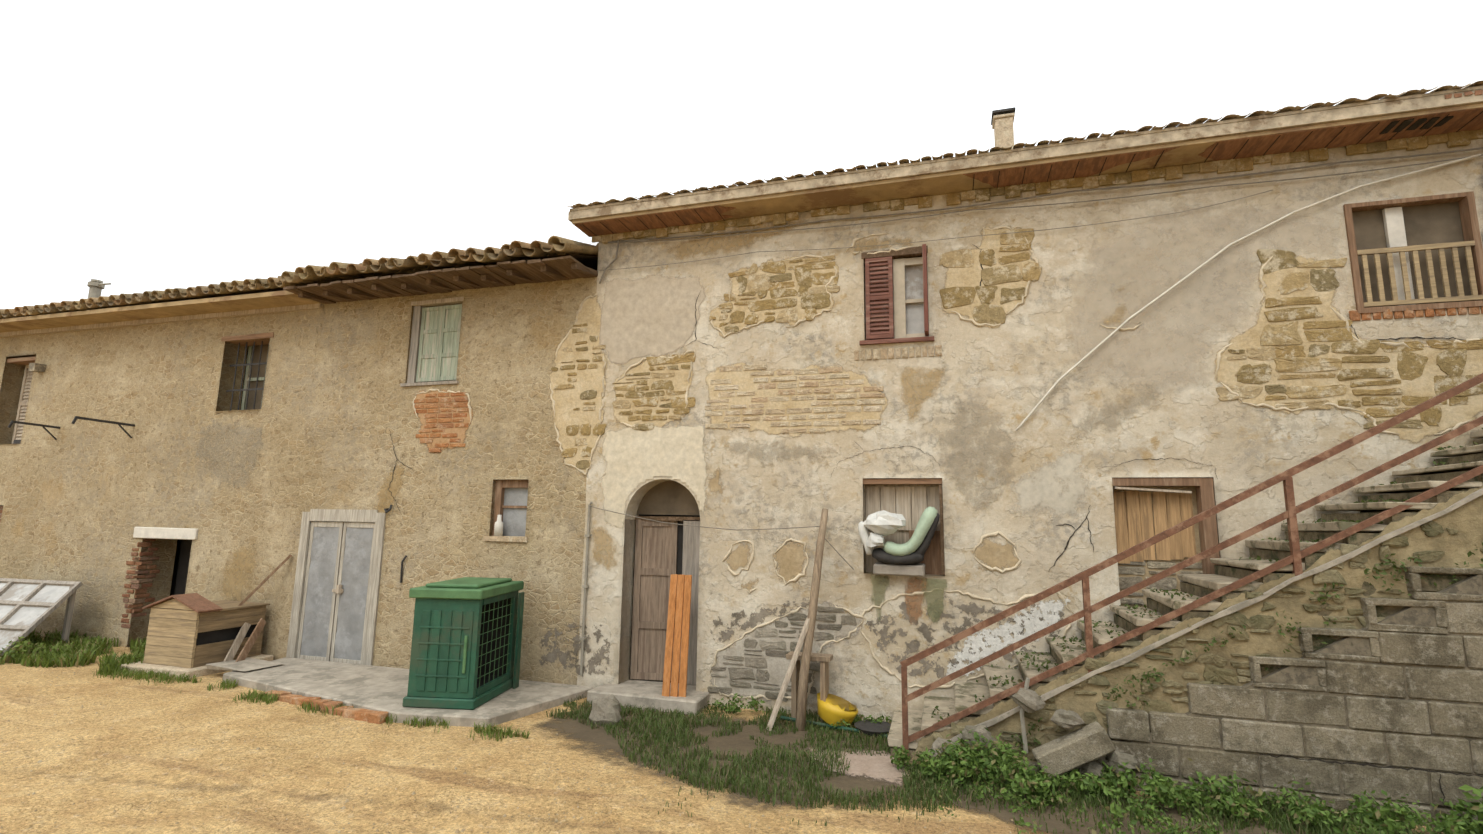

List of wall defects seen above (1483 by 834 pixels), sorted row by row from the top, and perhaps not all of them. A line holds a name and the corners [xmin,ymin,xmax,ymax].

flaking render [575,206,795,257]
flaking render [939,226,1042,328]
flaking render [1215,249,1483,443]
flaking render [412,389,473,453]
flaking render [550,233,918,568]
flaking render [972,531,1022,574]
crack [1049,506,1094,570]
flaking render [707,538,1075,702]